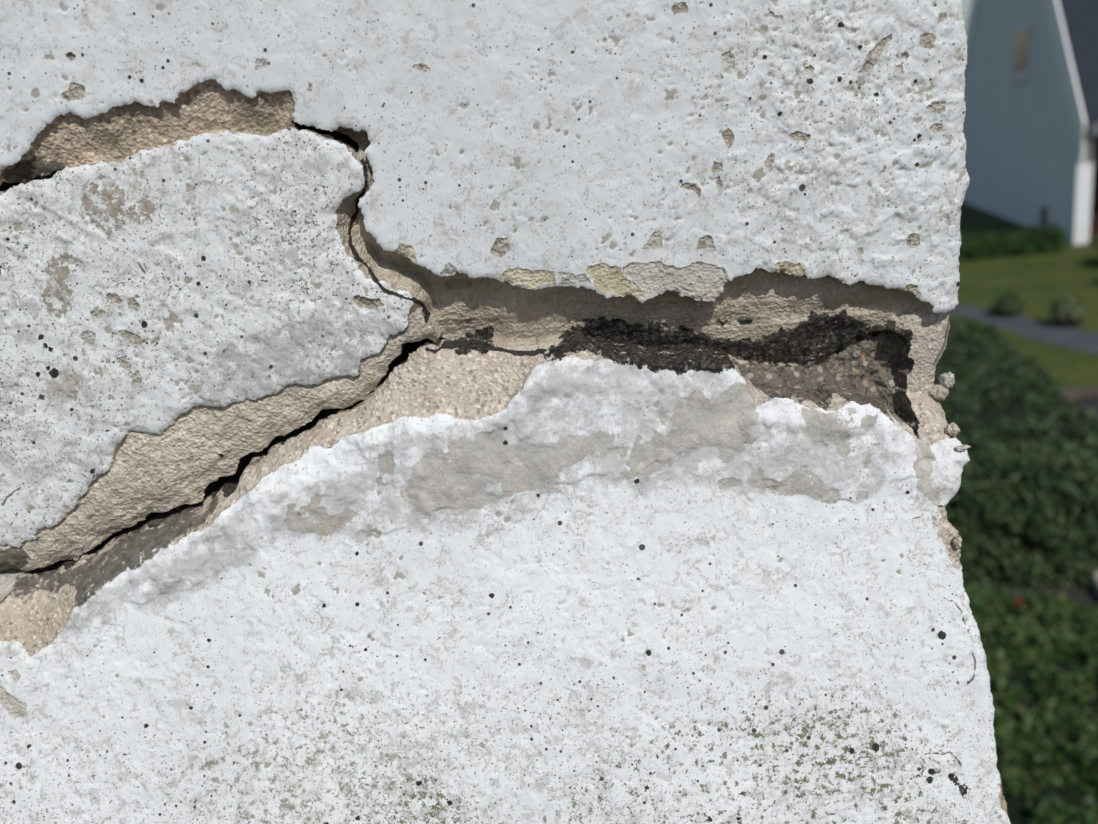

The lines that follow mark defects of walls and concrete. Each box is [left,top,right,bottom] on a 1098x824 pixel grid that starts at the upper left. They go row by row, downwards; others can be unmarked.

crack [0,121,571,604]
water stain [455,326,494,355]
spalling [0,79,971,657]
water stain [543,309,913,375]
peeling [0,669,28,718]